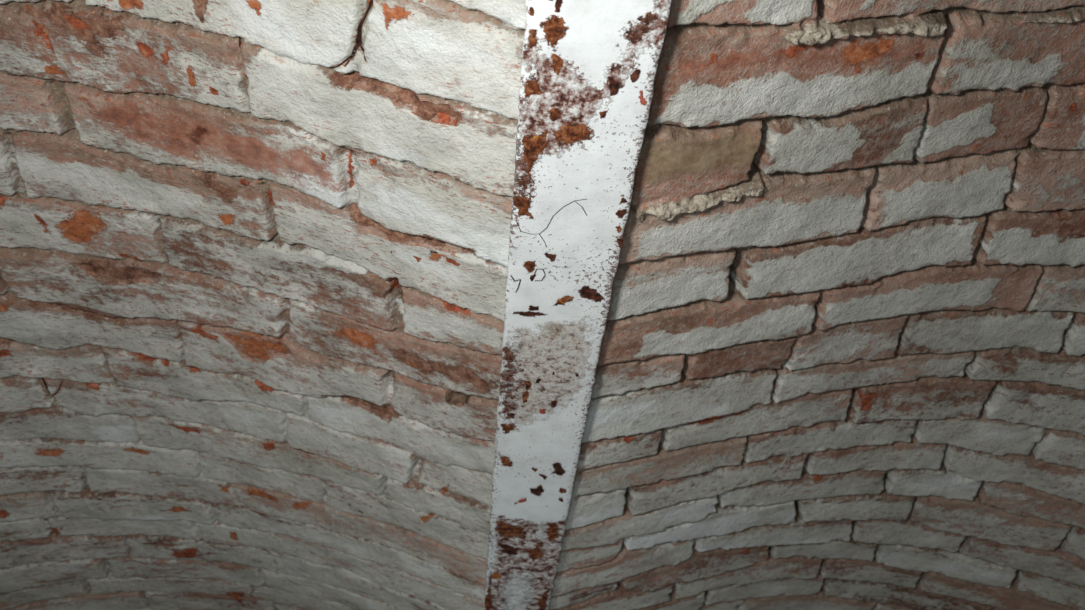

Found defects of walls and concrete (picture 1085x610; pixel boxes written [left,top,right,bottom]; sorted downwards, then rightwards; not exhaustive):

crack [328,0,373,69]
peeling [518,0,670,168]
peeling [663,33,928,97]
peeling [34,205,108,246]
spalling [1050,209,1085,239]
spalling [81,253,161,285]
spalling [183,324,289,361]
peeling [485,515,566,610]